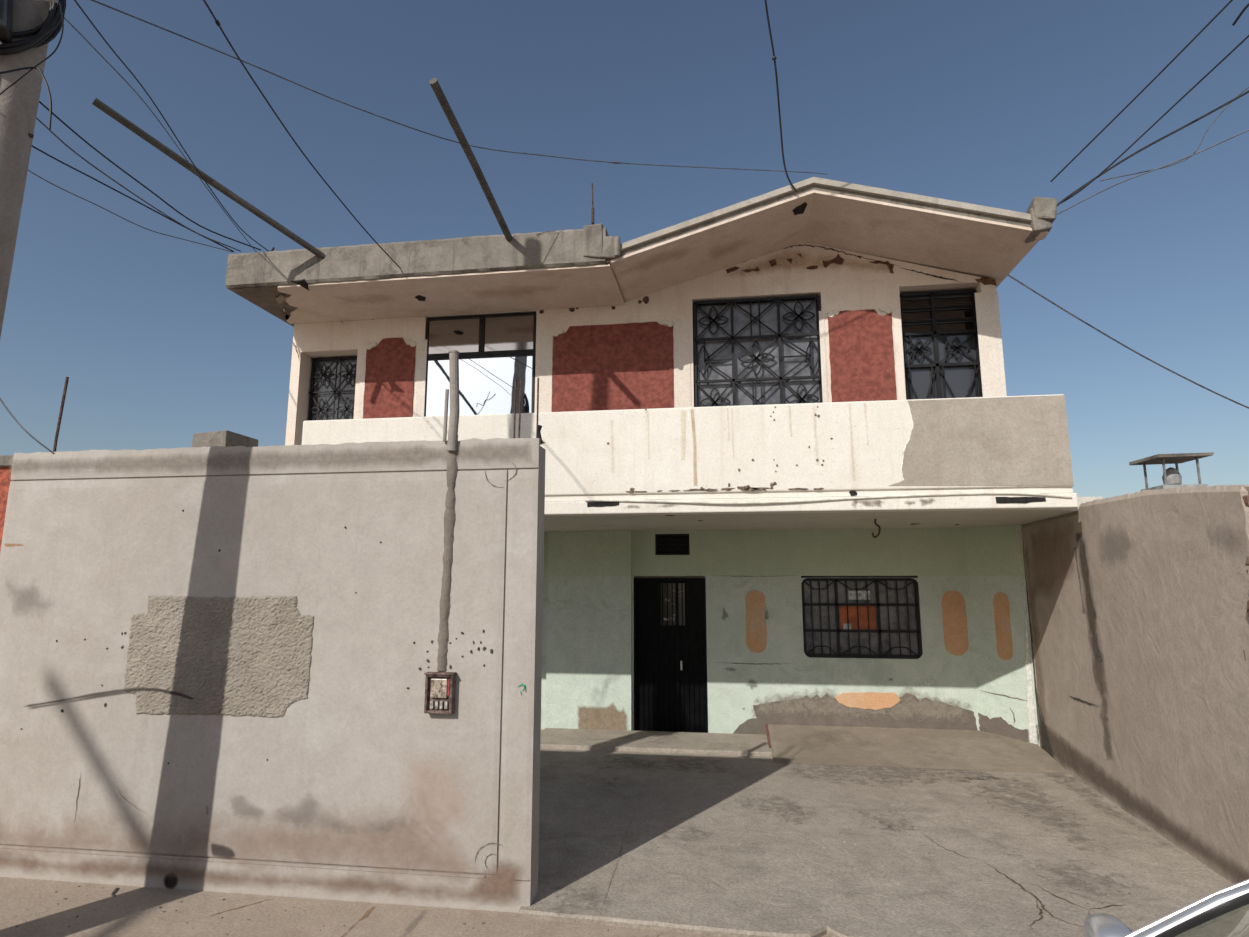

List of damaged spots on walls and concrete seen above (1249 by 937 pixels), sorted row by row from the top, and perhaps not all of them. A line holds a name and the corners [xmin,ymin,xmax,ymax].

peeling [889,395,1074,486]
water stain [1029,534,1249,882]
crack [921,832,1126,930]